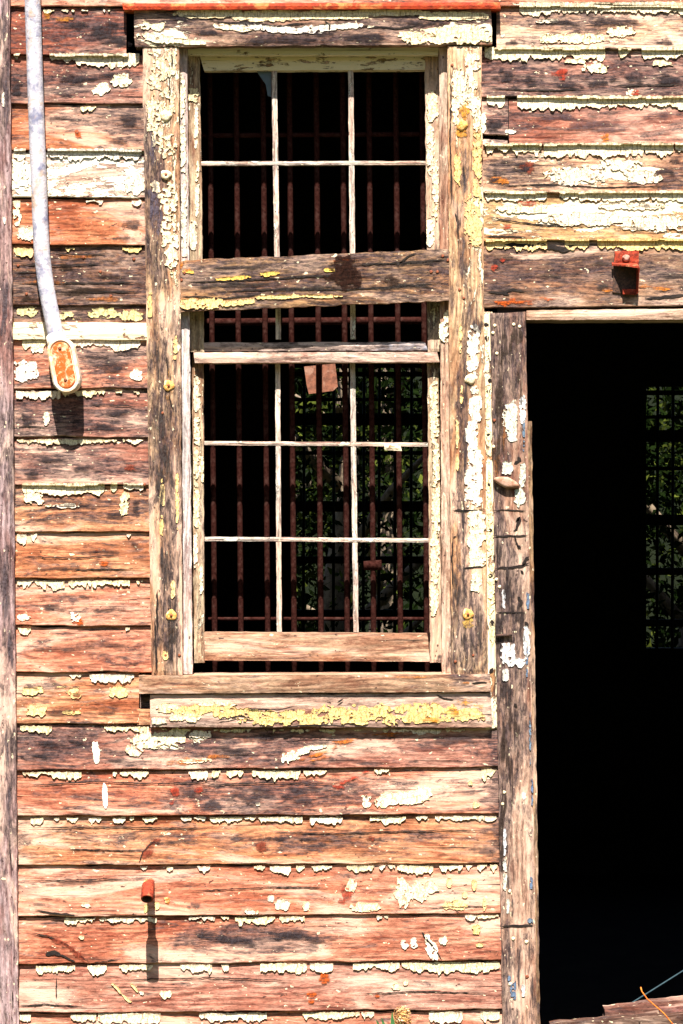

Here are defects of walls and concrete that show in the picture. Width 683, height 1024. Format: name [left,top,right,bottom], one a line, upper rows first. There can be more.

peeling [47,1,683,274]
peeling [180,294,343,309]
rust [324,255,366,291]
peeling [14,339,143,425]
peeling [22,482,144,516]
peeling [455,385,530,681]
peeling [104,701,497,782]
peeling [362,786,496,825]
peeling [189,895,310,926]
peeling [345,829,510,947]
peeling [71,964,160,1024]
peeling [353,934,525,999]